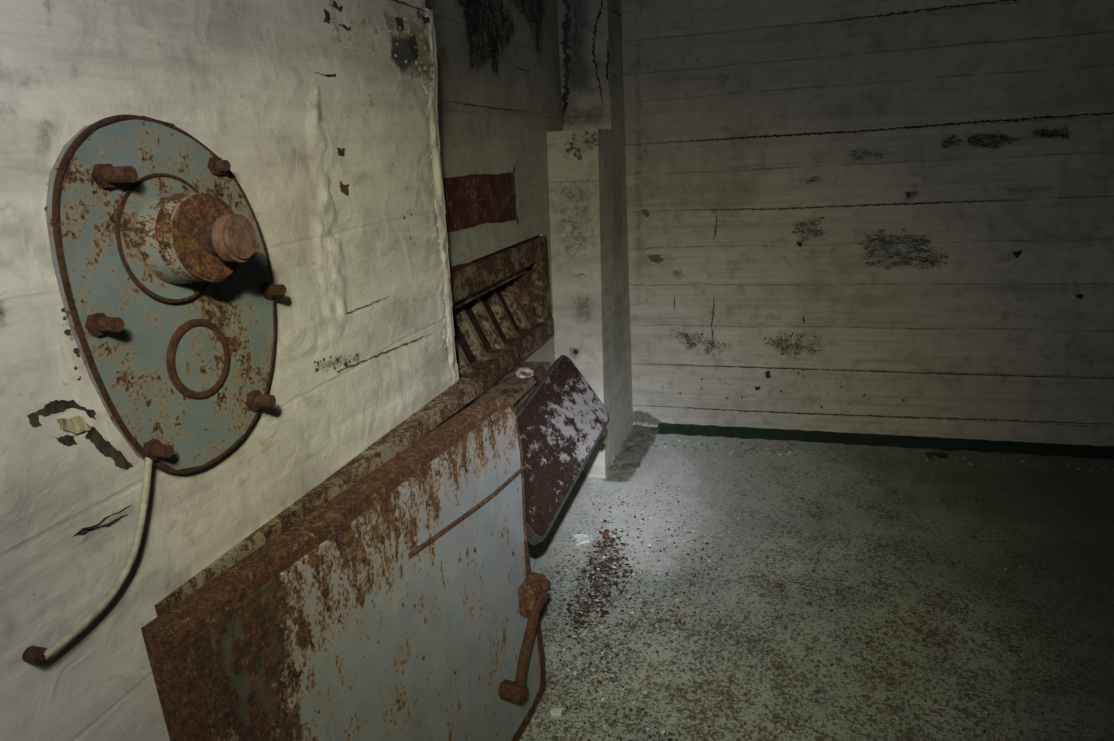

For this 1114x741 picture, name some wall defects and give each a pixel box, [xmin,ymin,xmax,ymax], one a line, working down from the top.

damp [455,0,546,75]
crack [560,0,622,123]
corrosion [228,170,273,281]
spalling [324,0,459,383]
corrosion [52,114,262,474]
corrosion [264,297,276,395]
spalling [26,400,133,469]